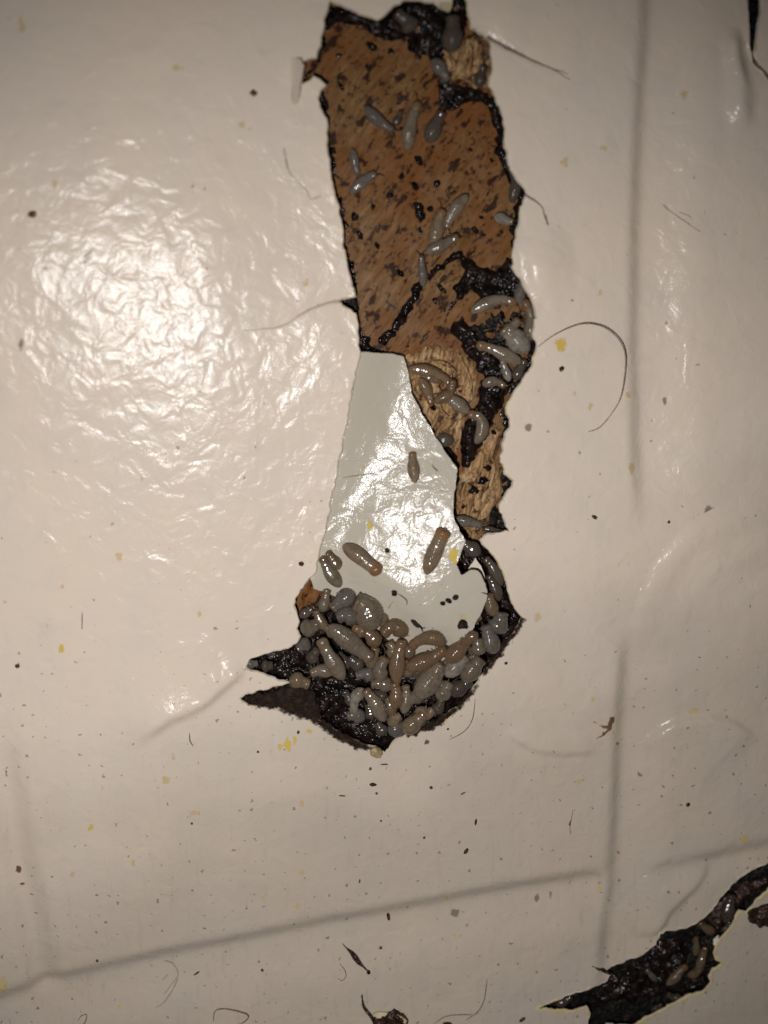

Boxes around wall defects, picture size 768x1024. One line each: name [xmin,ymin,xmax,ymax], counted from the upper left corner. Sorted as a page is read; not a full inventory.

peeling [239,0,537,753]
peeling [534,861,768,1024]